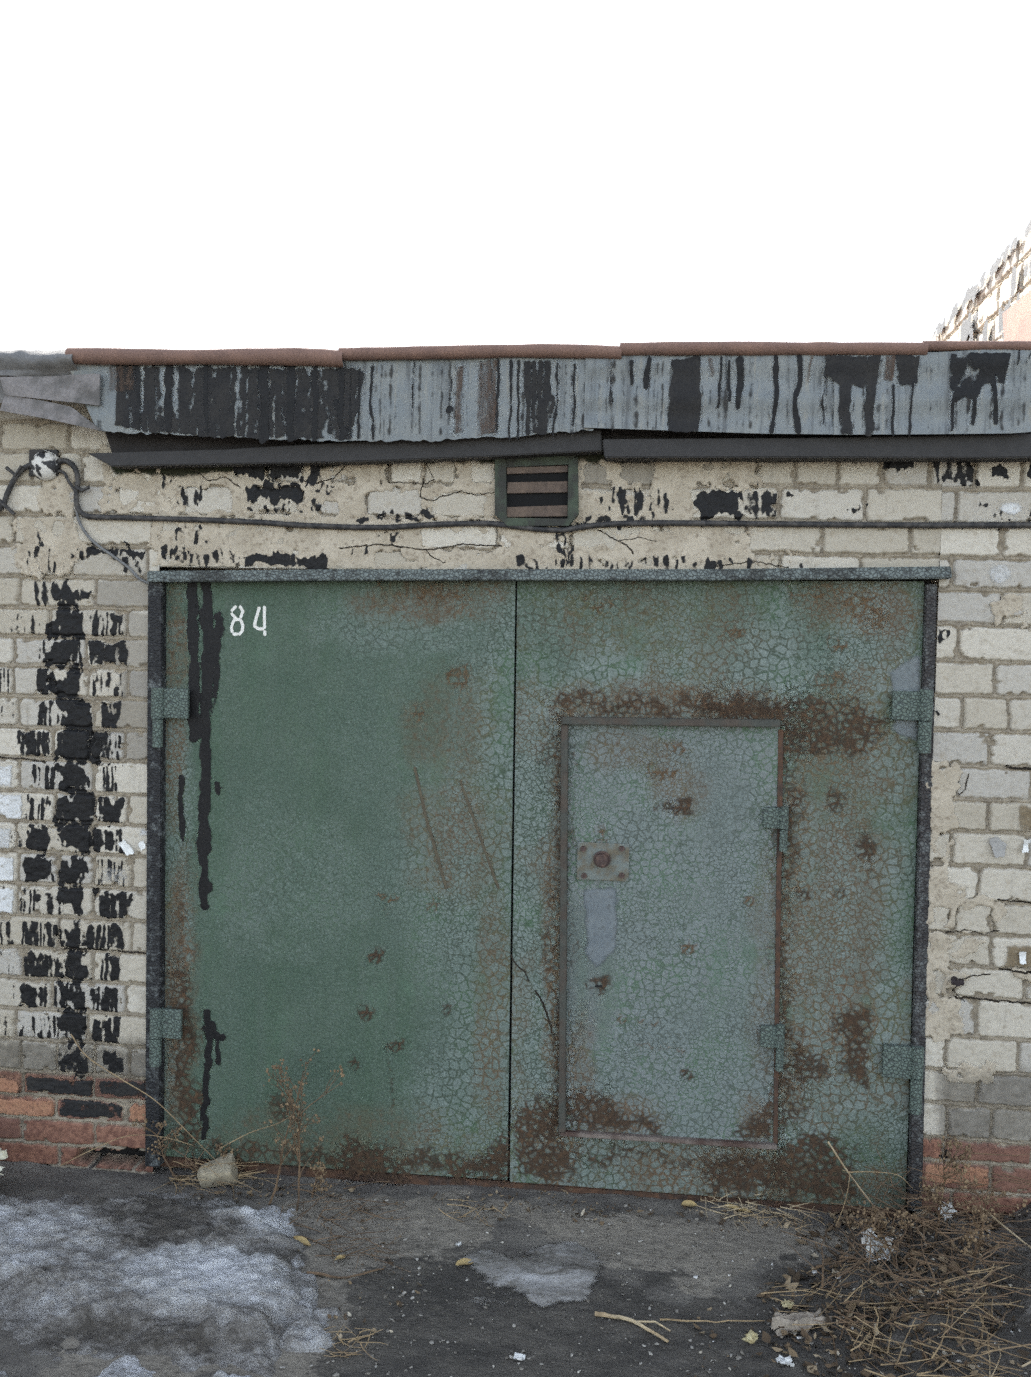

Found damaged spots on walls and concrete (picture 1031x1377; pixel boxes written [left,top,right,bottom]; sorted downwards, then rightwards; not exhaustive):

spalling [507,465,568,518]
rust [554,672,887,915]
rust [167,926,872,1202]
crack [510,954,552,1033]